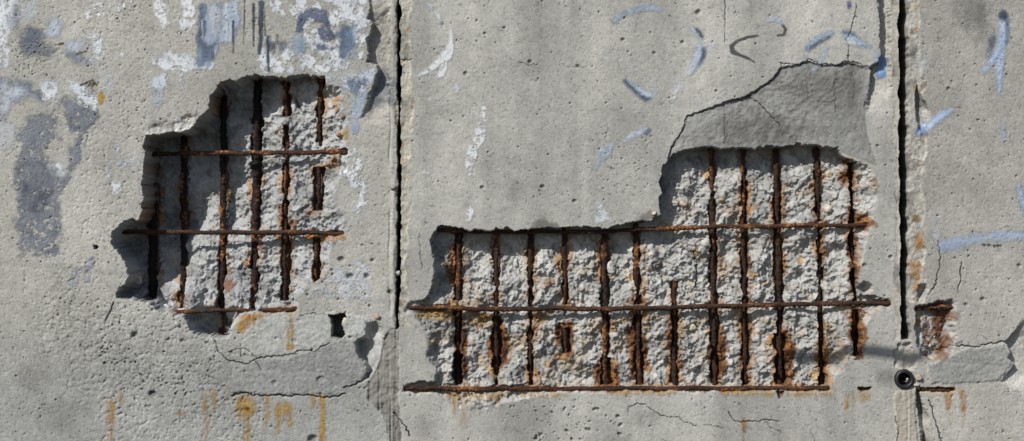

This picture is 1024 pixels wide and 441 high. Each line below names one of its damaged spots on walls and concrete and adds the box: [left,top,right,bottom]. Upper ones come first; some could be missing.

spalling [109,0,960,412]
corrosion [839,159,848,186]
corrosion [847,206,877,287]
corrosion [418,310,509,377]
corrosion [533,312,575,358]
corrosion [593,295,648,393]
corrosion [708,308,808,396]
corrosion [848,307,868,358]
corrosion [239,397,291,441]
corrosion [312,395,325,441]